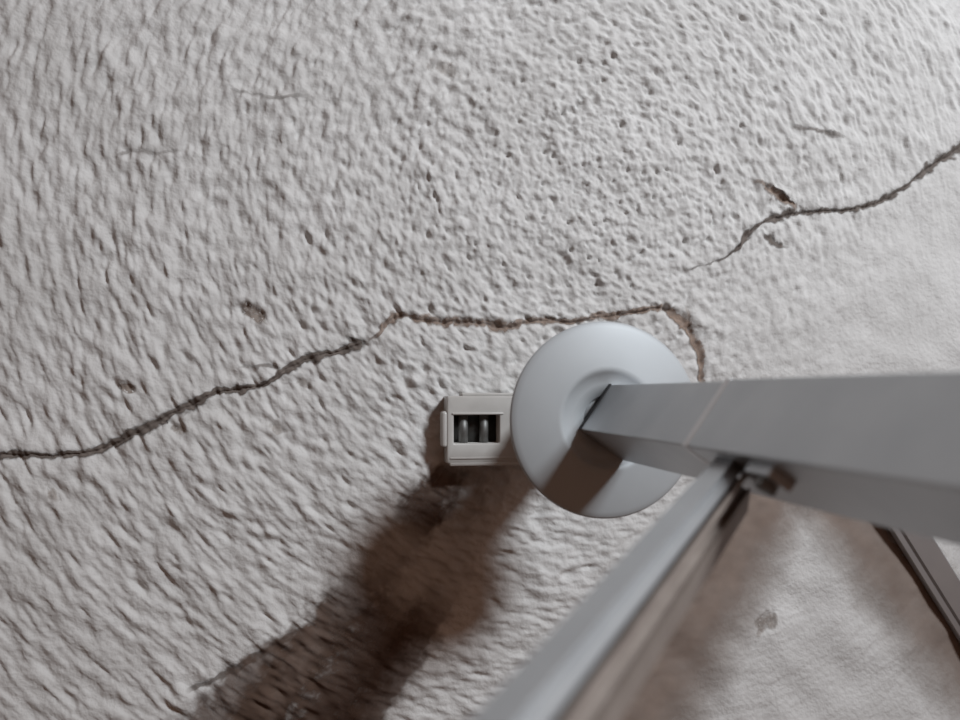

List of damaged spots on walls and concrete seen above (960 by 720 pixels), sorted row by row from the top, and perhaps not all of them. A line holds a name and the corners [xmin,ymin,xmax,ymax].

crack [710,144,960,264]
crack [0,304,705,459]